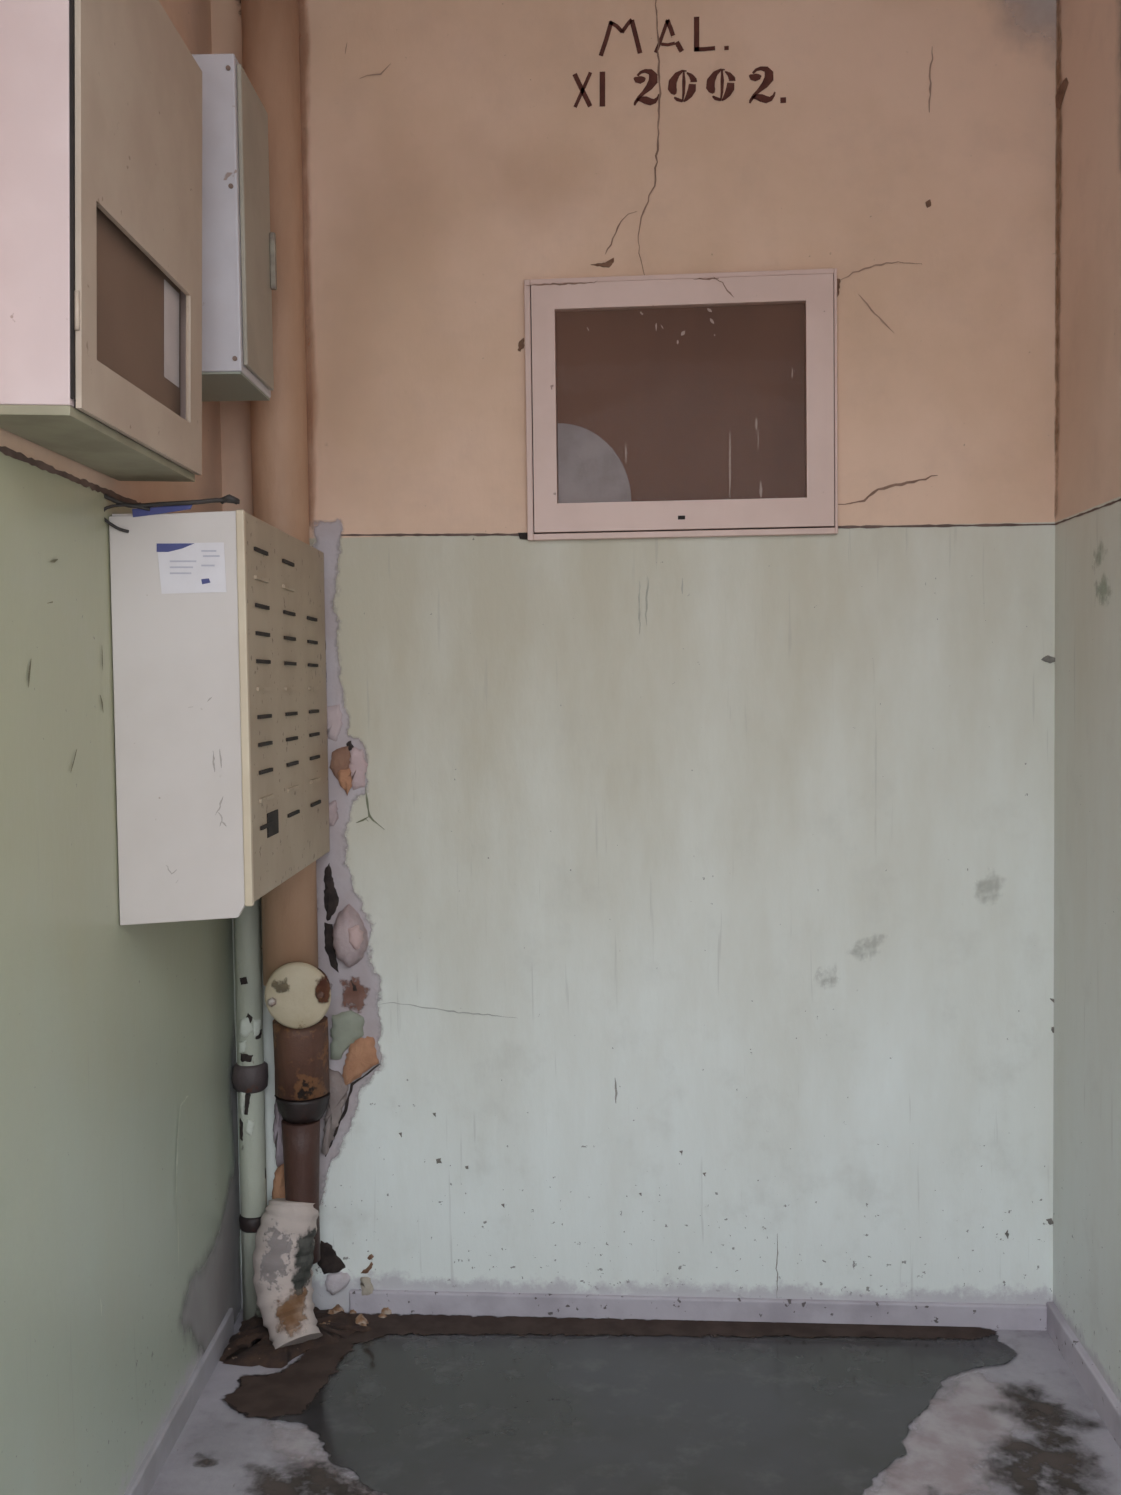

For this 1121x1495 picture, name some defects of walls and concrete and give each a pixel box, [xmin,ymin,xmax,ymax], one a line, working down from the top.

corrosion [298,0,313,440]
crack [526,0,662,286]
damp [1008,0,1061,449]
crack [838,475,938,505]
spalling [313,519,382,1205]
damp [871,1374,1097,1495]